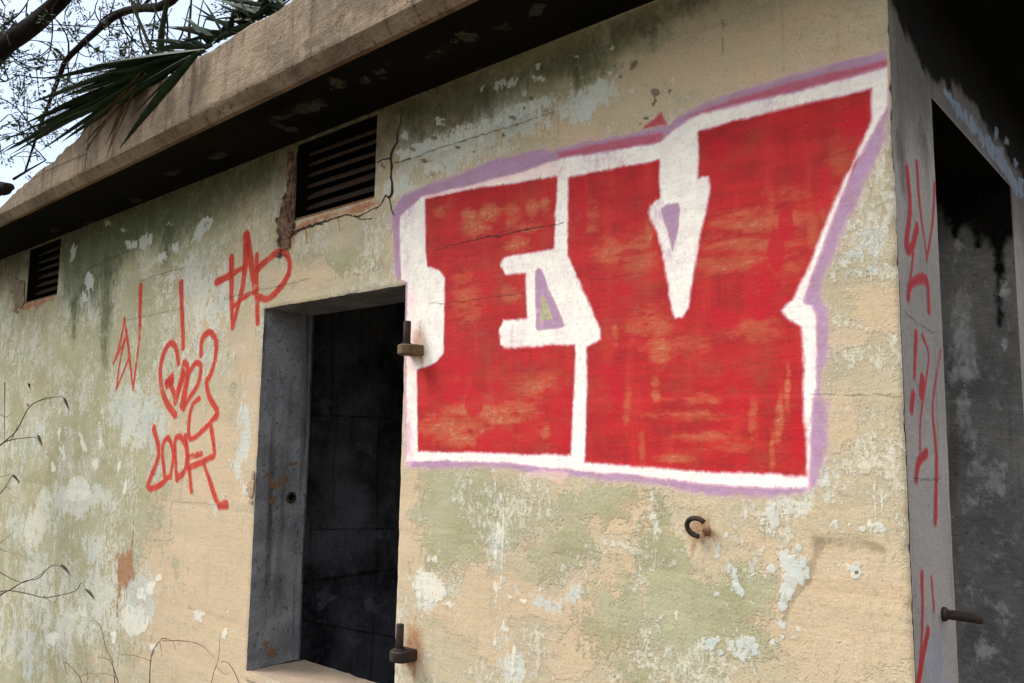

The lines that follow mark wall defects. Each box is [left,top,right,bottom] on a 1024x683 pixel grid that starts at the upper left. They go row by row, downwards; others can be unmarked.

peeling [395,63,552,176]
peeling [574,60,638,123]
peeling [639,89,671,125]
peeling [104,216,213,263]
spalling [275,151,296,258]
crack [291,112,402,236]
peeling [80,272,94,304]
leakage [101,258,113,351]
corrosion [115,532,134,617]
peeling [412,555,455,609]
peeling [701,544,810,663]